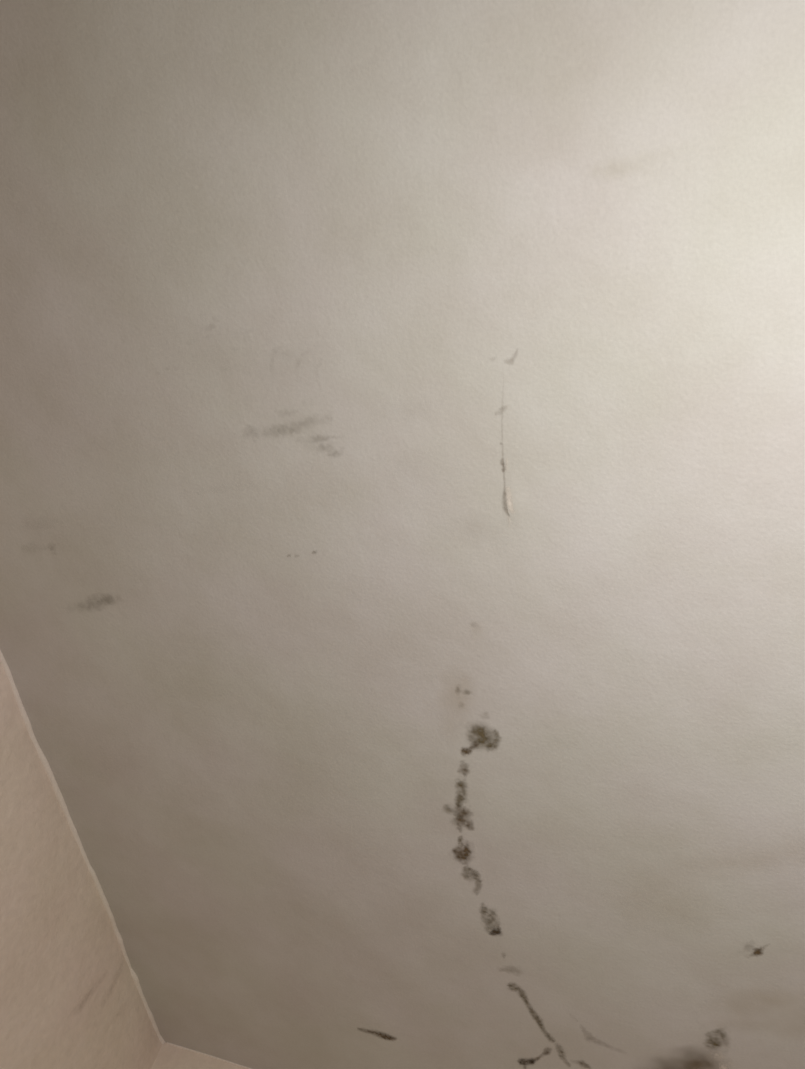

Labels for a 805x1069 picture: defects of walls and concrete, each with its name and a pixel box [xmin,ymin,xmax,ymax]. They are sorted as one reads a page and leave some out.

leakage [462,727,497,754]
leakage [457,769,470,827]
leakage [453,839,471,870]
crack [509,985,582,1065]